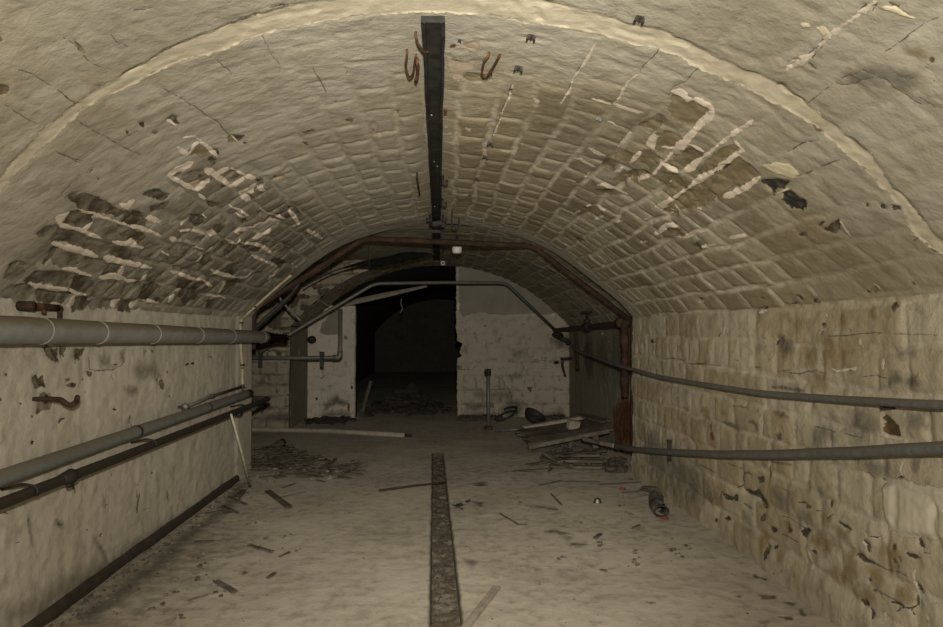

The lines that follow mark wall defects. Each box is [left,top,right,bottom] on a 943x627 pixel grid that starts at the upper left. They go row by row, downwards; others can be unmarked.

crack [882,2,938,51]
peeling [0,0,943,254]
flaking render [1,135,323,312]
corrosion [614,400,631,446]
spalling [880,415,903,441]